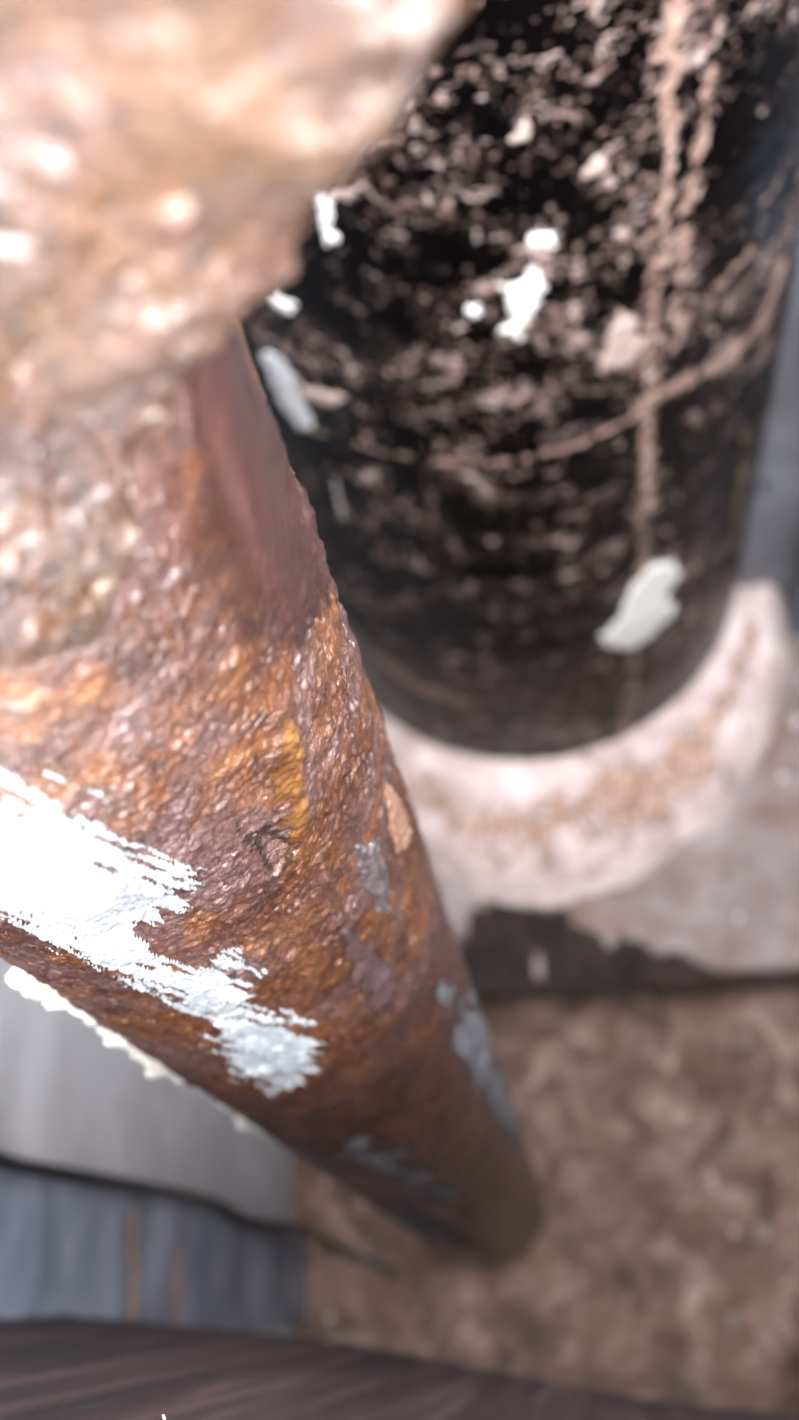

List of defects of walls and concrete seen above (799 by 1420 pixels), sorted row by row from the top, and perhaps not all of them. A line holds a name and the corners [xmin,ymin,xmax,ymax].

spalling [508,118,531,142]
spalling [581,156,609,185]
spalling [314,197,340,246]
spalling [497,266,547,340]
spalling [597,310,645,373]
spalling [261,350,348,430]
rust [190,326,331,645]
spalling [599,559,682,650]
rust [272,717,310,843]
peeling [0,770,326,1097]
rust [340,927,395,1013]
peeling [4,966,278,1143]